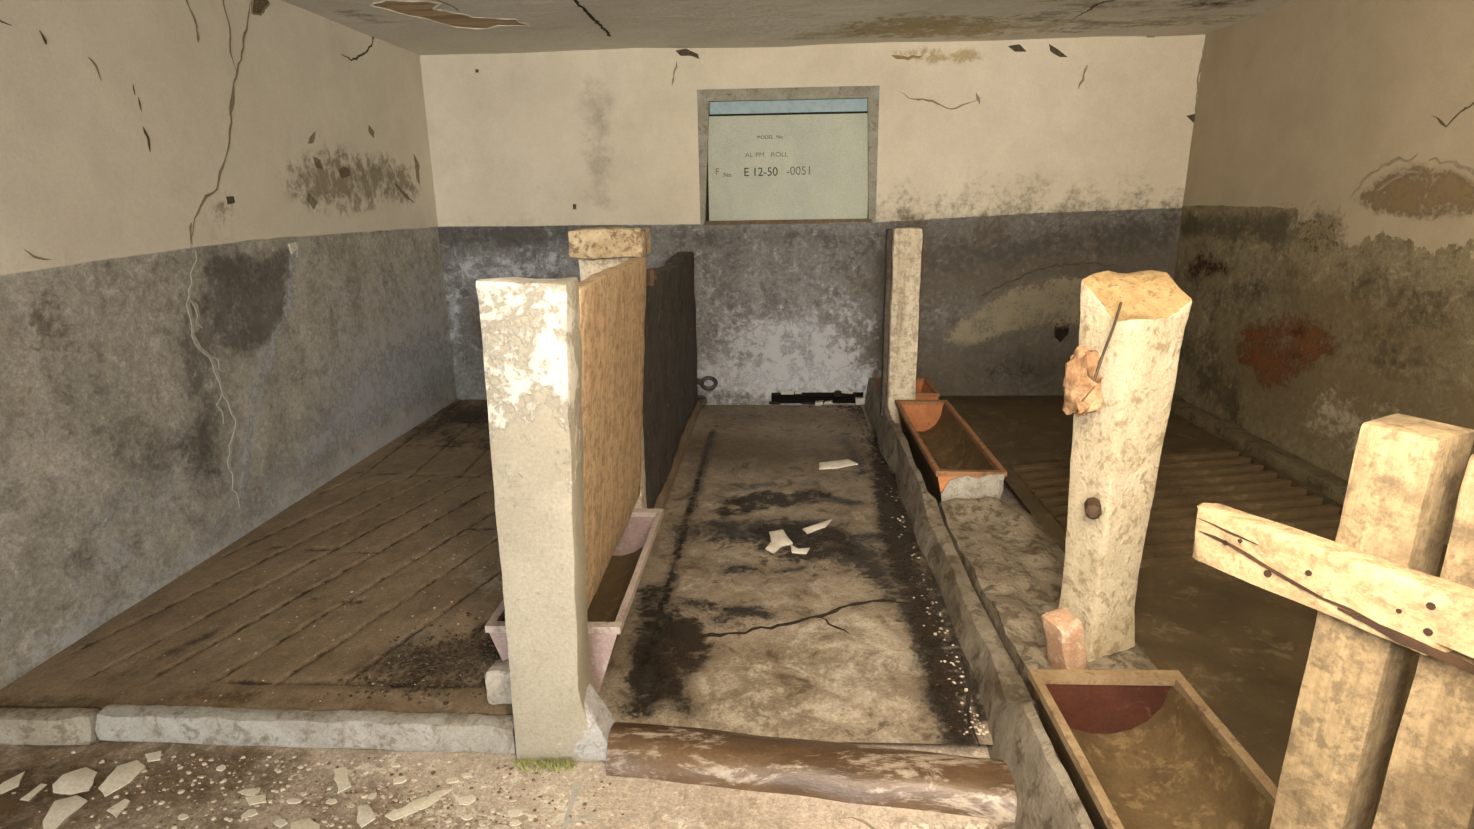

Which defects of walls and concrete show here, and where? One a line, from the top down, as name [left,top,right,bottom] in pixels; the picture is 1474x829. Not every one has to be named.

flaking render [370,0,531,29]
crack [574,0,611,37]
crack [341,37,374,61]
crack [1433,102,1474,127]
damp [295,131,420,209]
crack [186,0,252,507]
damp [202,242,458,513]
crack [659,599,925,645]